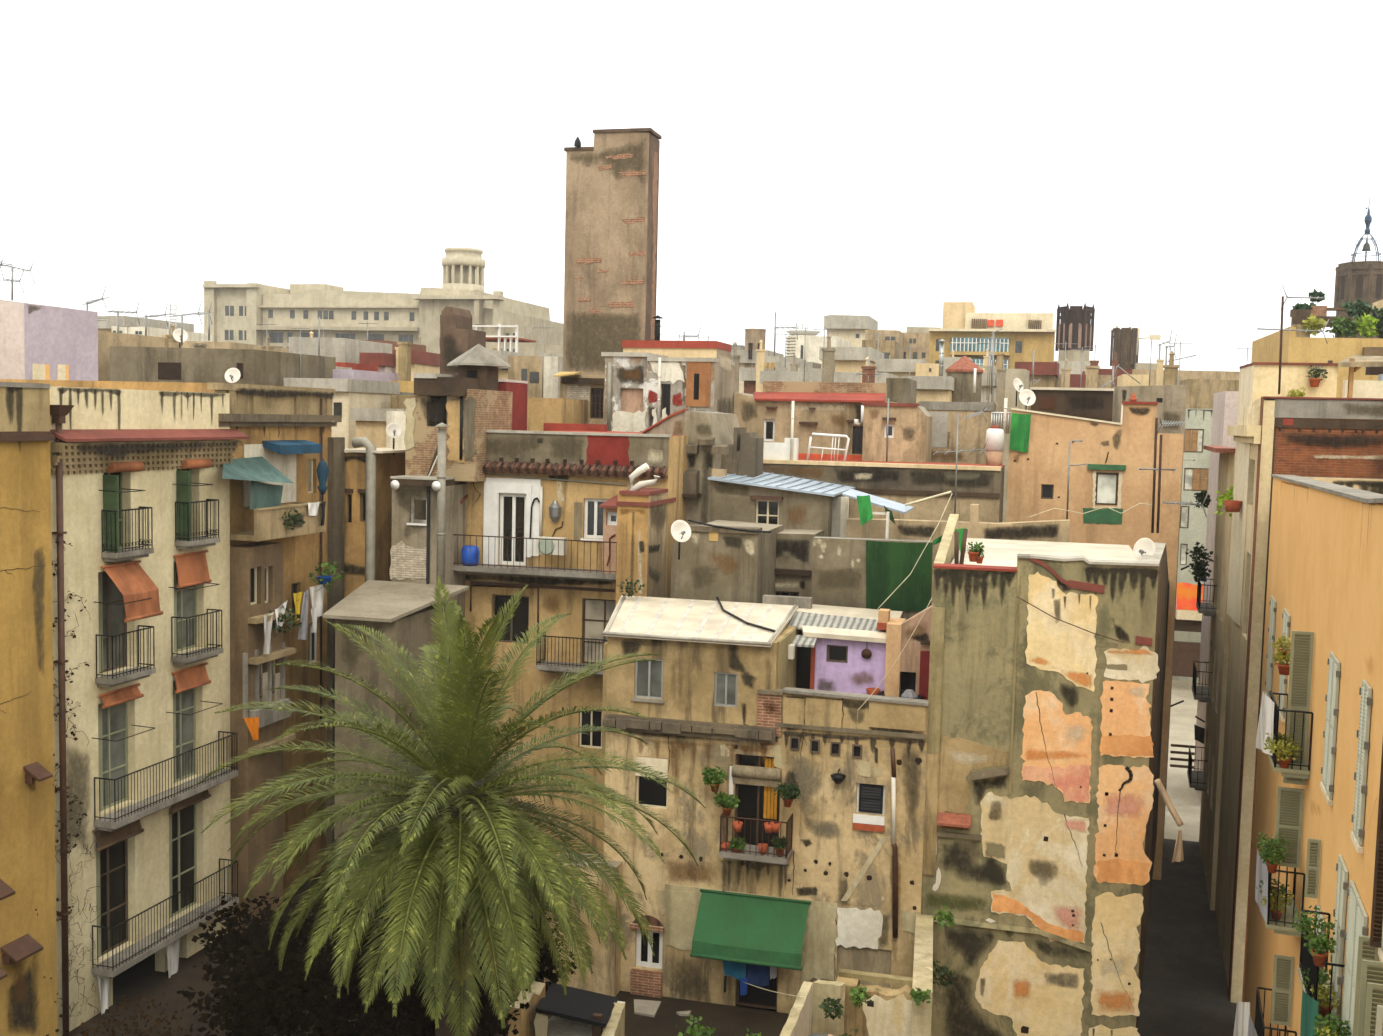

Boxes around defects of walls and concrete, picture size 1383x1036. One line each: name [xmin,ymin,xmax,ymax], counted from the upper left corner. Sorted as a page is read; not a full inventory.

damp [59,388,121,430]
damp [160,391,225,420]
damp [934,569,1014,610]
flaking render [938,572,1160,1036]
crack [1115,767,1133,850]